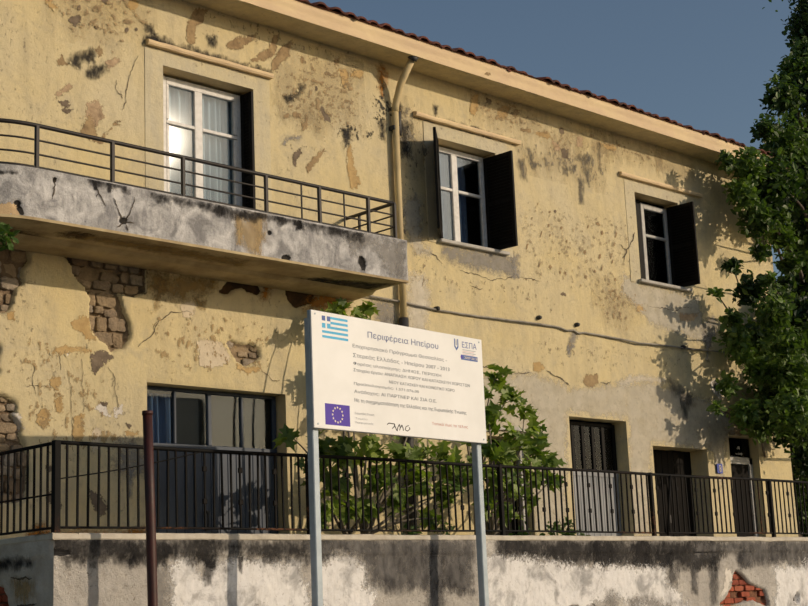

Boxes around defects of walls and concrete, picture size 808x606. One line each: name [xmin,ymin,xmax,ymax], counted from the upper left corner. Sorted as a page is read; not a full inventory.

peeling [80,100,121,144]
damp [337,86,411,157]
crack [96,188,135,231]
crack [138,311,183,347]
flaking render [156,298,280,381]
flaking render [0,247,155,505]
flaking render [0,587,9,606]
damp [28,525,147,567]
damp [156,540,311,606]
damp [321,540,475,606]
damp [496,540,808,604]
flaking render [719,568,770,606]